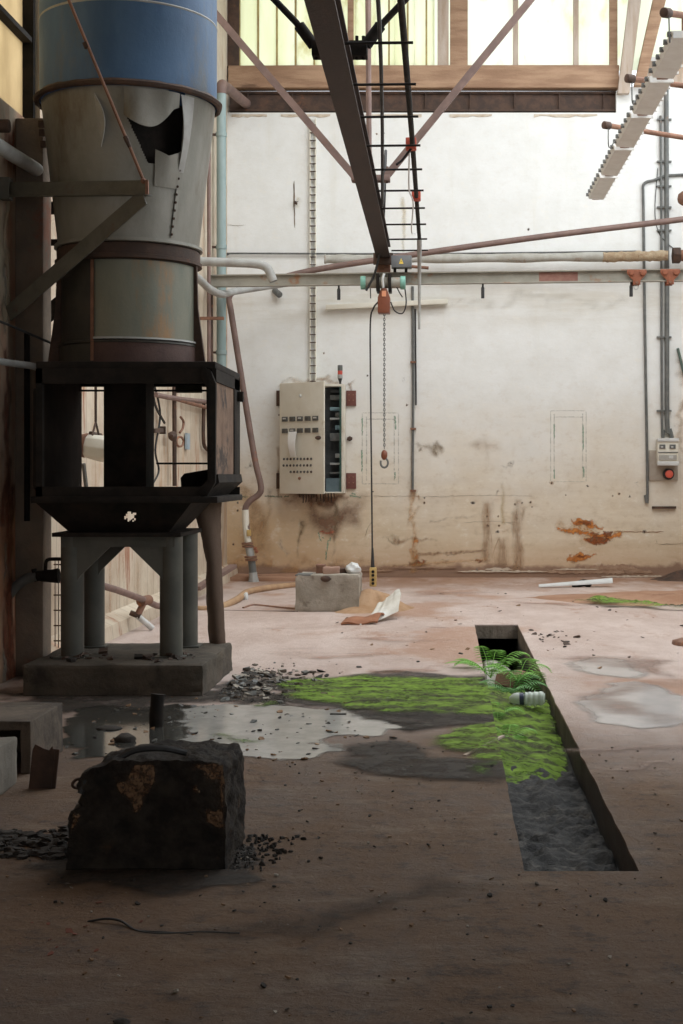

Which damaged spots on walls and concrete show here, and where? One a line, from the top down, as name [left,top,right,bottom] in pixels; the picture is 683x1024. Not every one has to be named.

leakage [298,494,338,529]
rust [557,518,622,562]
leakage [9,693,151,712]
leakage [164,670,506,779]